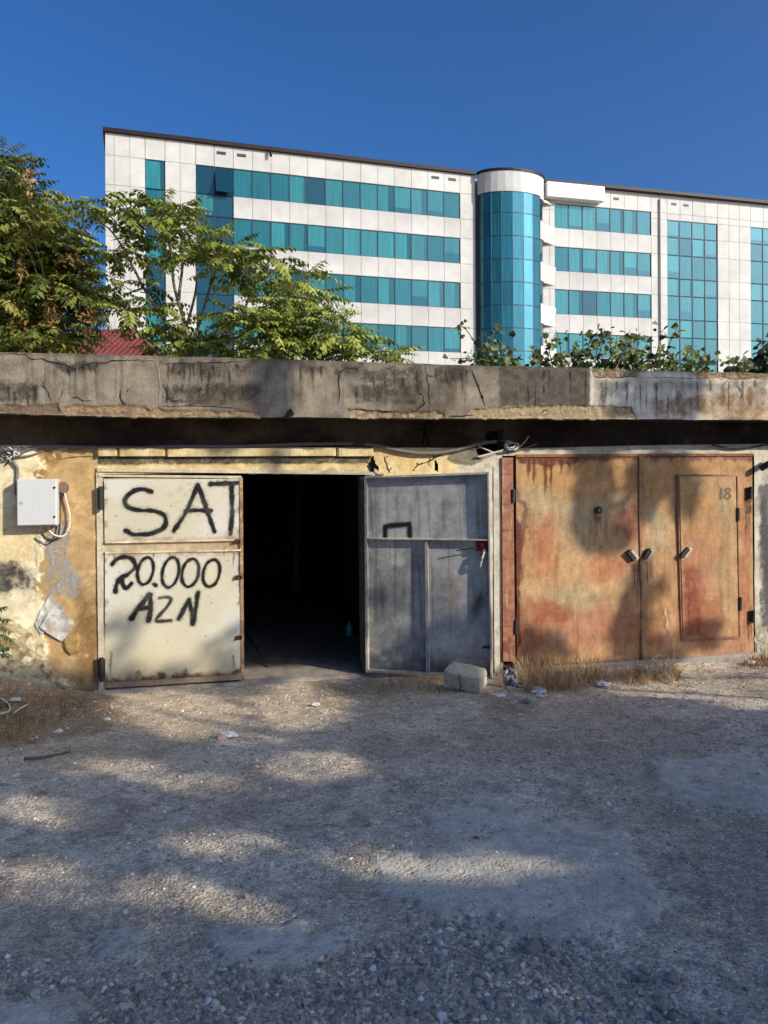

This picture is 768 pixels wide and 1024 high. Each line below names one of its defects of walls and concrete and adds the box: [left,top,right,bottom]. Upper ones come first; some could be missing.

crack [3,353,251,408]
leakage [166,360,251,404]
crack [338,366,485,472]
leakage [601,382,669,409]
corrosion [518,457,577,488]
peeling [34,528,47,601]
flaking render [0,623,76,690]